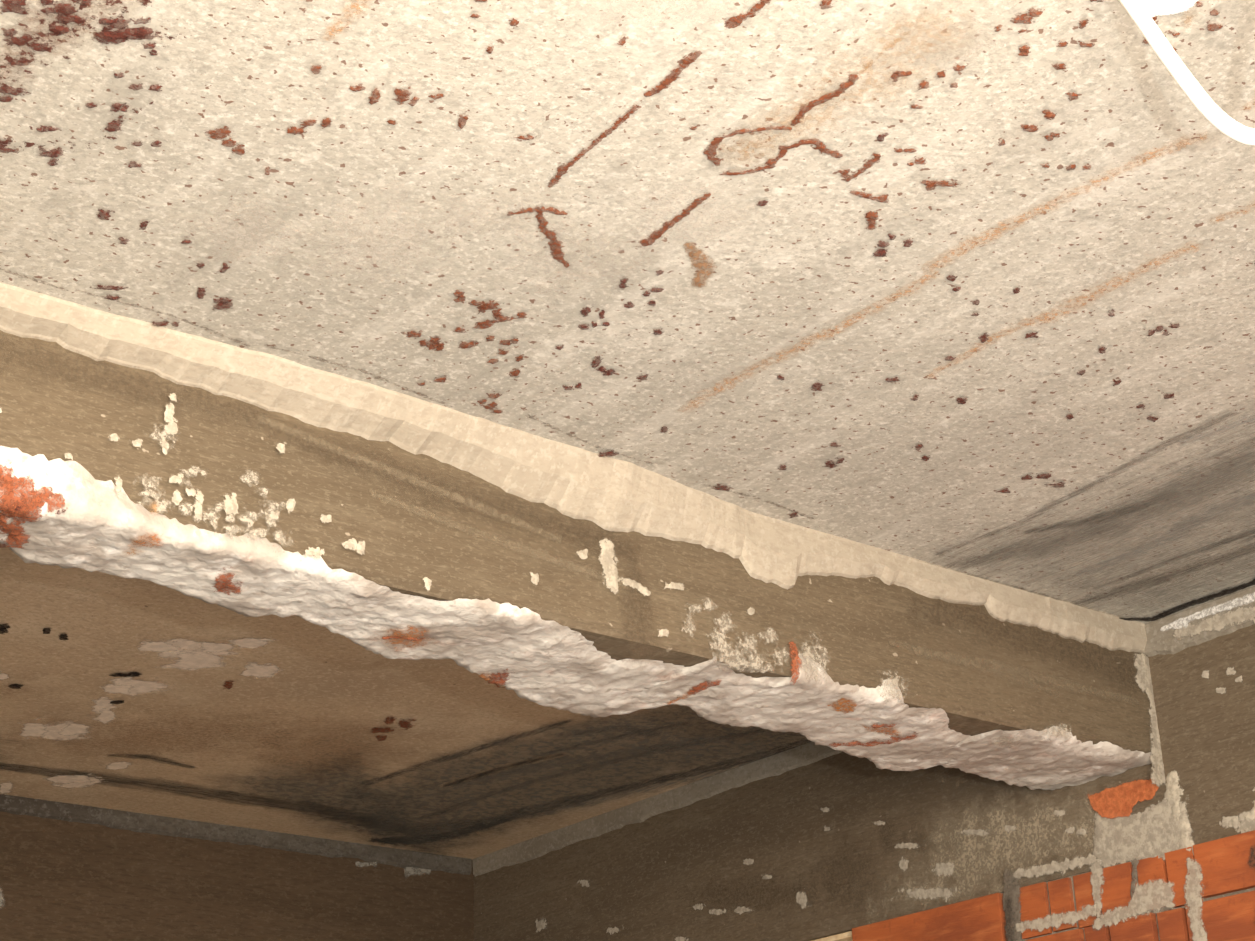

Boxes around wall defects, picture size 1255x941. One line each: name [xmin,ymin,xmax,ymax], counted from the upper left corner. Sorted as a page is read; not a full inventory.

peeling [1140,0,1199,17]
corrosion [349,84,444,106]
corrosion [891,63,968,109]
corrosion [205,126,245,155]
corrosion [894,148,959,191]
corrosion [0,462,66,548]
water stain [963,450,1255,574]
water stain [1075,530,1255,605]
crack [1119,579,1255,621]
water stain [890,642,1166,787]
water stain [0,706,808,848]
peeling [1219,811,1255,833]